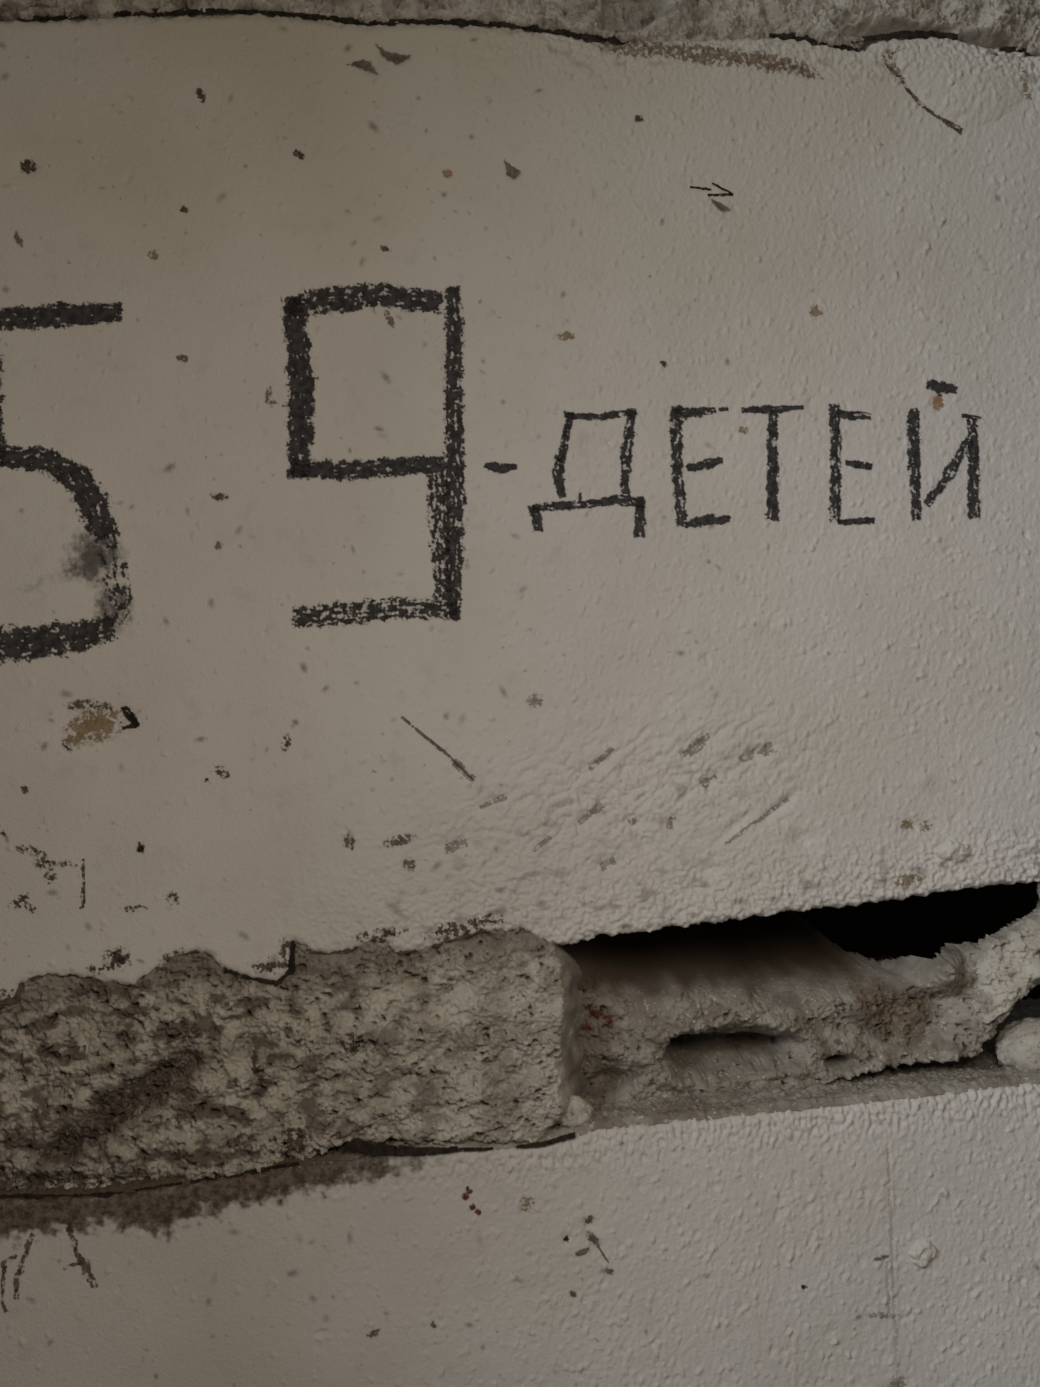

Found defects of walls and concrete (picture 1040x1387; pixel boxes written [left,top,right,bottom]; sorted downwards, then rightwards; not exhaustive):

spalling [559,899,1040,1105]